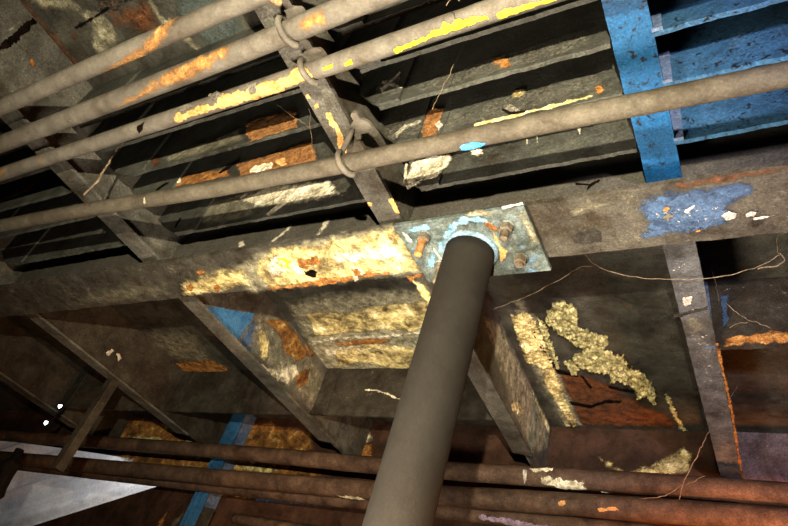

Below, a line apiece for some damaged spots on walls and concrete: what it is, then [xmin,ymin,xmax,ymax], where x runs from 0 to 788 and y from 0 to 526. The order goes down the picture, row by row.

crack [75,0,128,29]
rust [126,47,226,102]
rust [176,141,316,186]
peeling [639,183,770,238]
water stain [184,218,419,296]
rust [484,222,507,263]
water stain [292,292,428,369]
water stain [529,384,550,432]
rust [715,330,788,479]